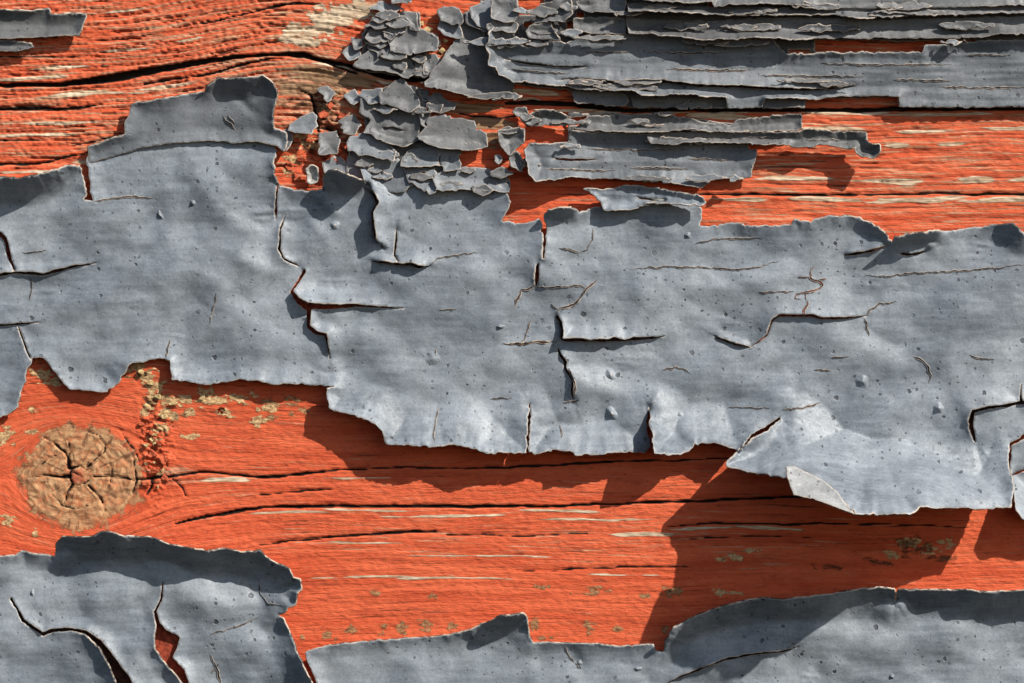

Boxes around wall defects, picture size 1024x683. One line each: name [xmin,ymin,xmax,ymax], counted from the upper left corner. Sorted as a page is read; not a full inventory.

crack [0,34,429,111]
crack [0,232,94,358]
peeling [0,0,1024,520]
crack [560,230,594,253]
crack [629,237,1019,347]
crack [503,264,657,437]
crack [969,390,1024,442]
crack [35,409,965,545]
crack [10,598,132,683]
peeling [0,531,1024,683]
crack [562,564,688,572]